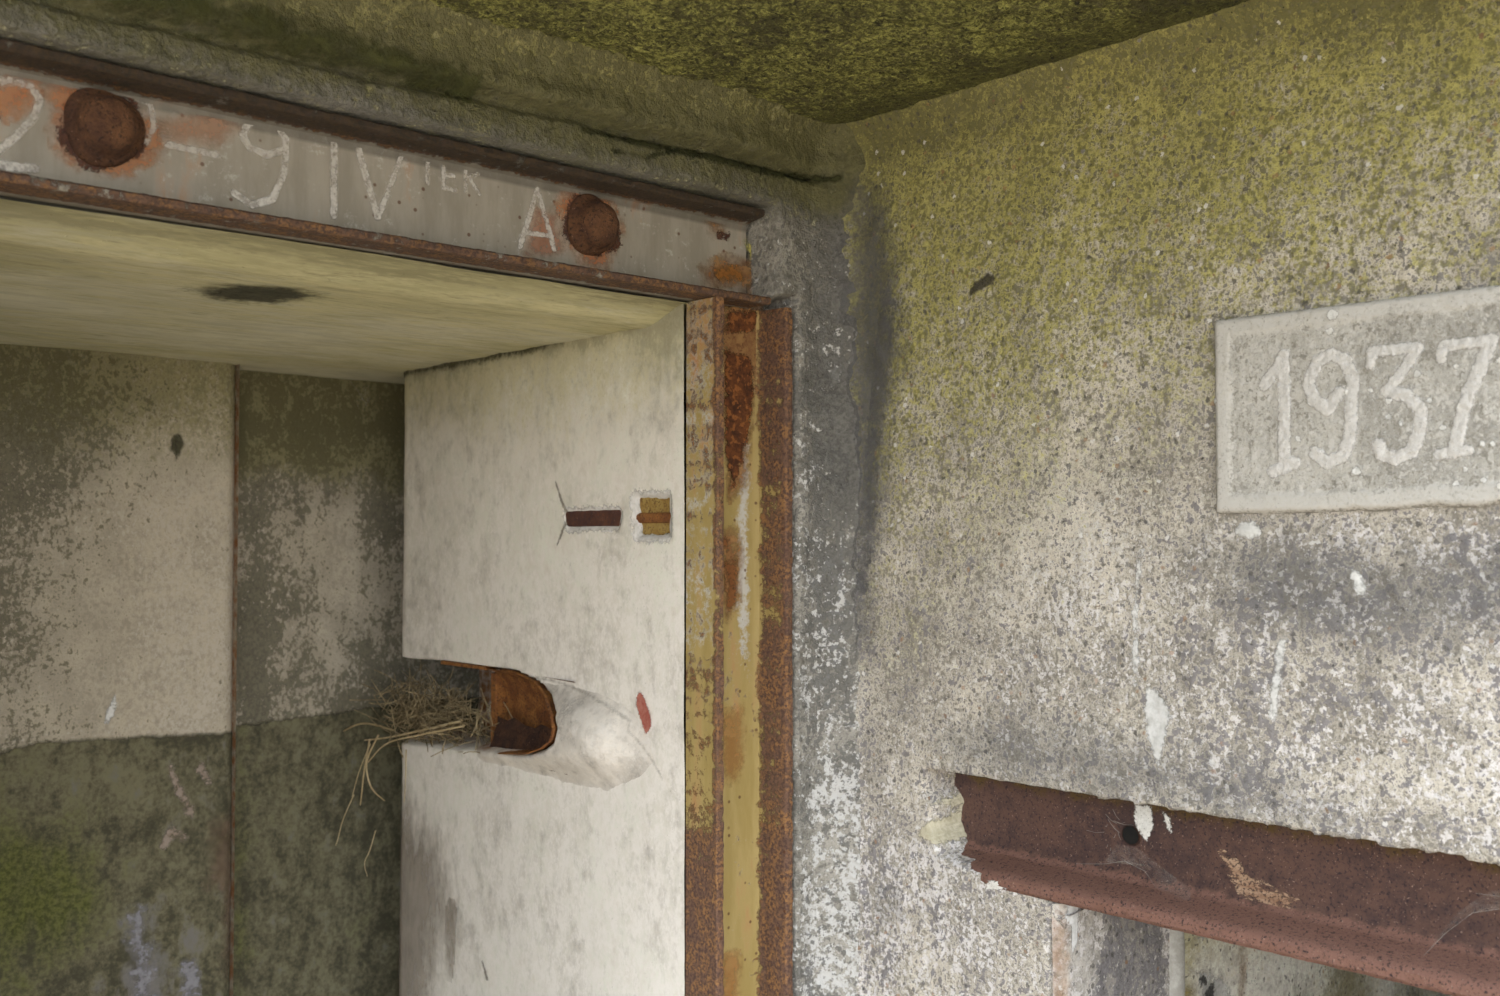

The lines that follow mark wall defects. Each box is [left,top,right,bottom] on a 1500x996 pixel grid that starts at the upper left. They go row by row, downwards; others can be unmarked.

corrosion [50,86,162,175]
corrosion [526,192,623,265]
corrosion [705,222,762,504]
corrosion [723,529,742,615]
water stain [399,807,454,996]
water stain [121,905,157,996]
water stain [179,961,201,996]